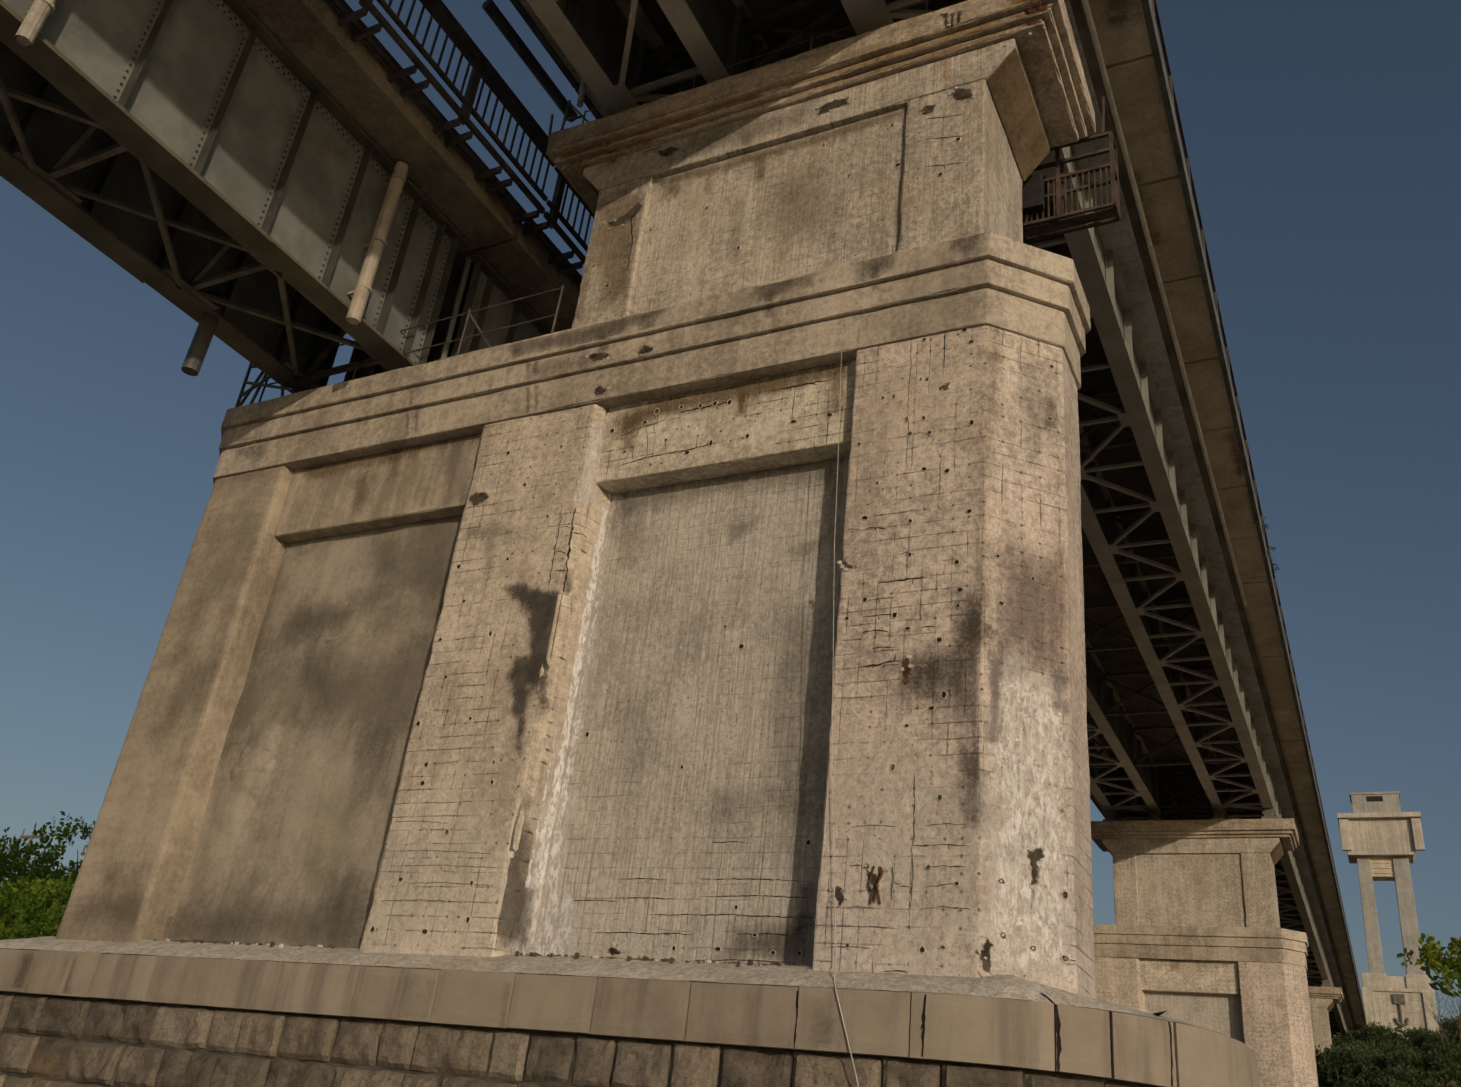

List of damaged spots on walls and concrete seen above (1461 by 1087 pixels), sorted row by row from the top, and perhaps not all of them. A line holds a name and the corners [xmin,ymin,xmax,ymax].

damp [497,364,844,956]
damp [908,600,985,714]
damp [994,548,1060,714]
damp [962,753,978,819]
crack [573,775,1034,1057]
crack [1040,993,1062,1077]